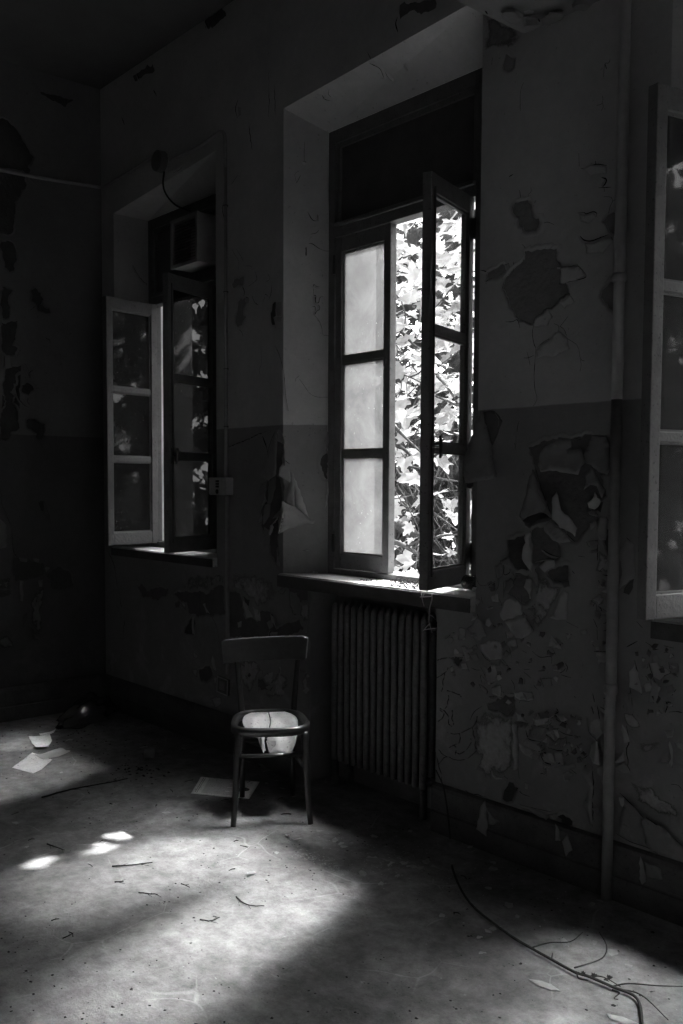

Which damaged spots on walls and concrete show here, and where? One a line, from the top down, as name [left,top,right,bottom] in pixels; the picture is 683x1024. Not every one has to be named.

peeling [499,190,587,327]
peeling [463,411,502,489]
peeling [257,425,315,570]
peeling [505,522,566,576]
flaking render [470,691,528,773]
peeling [617,793,683,884]